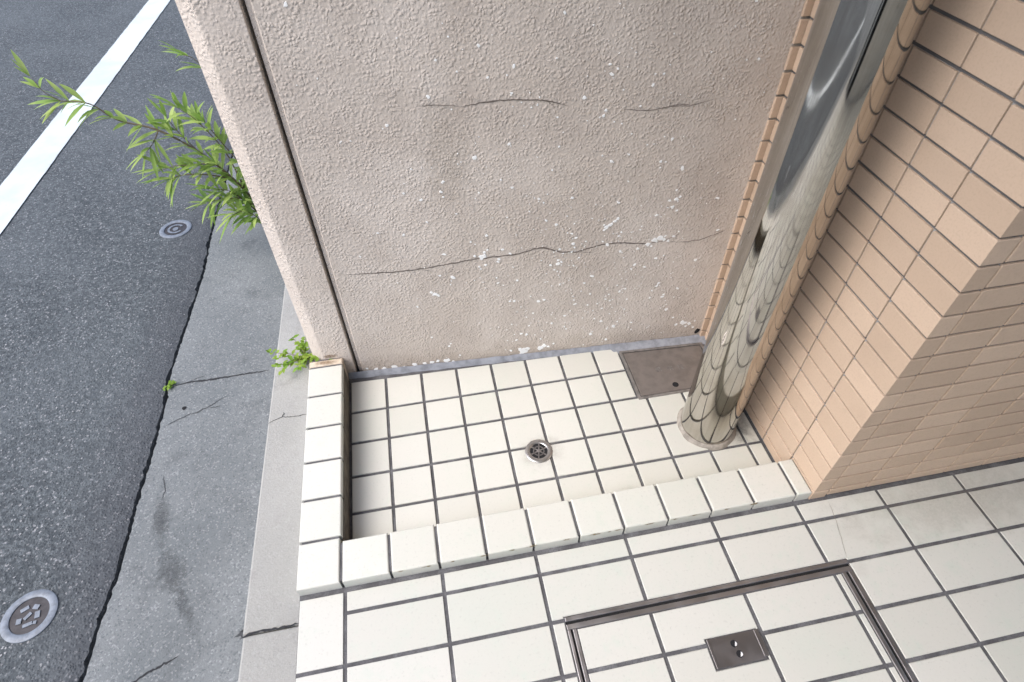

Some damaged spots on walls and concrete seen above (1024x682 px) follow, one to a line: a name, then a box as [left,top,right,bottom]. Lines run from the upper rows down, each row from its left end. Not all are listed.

crack [425,99,567,107]
crack [625,98,716,111]
crack [348,230,725,275]
crack [166,370,268,426]
crack [239,623,297,640]
crack [133,656,178,682]